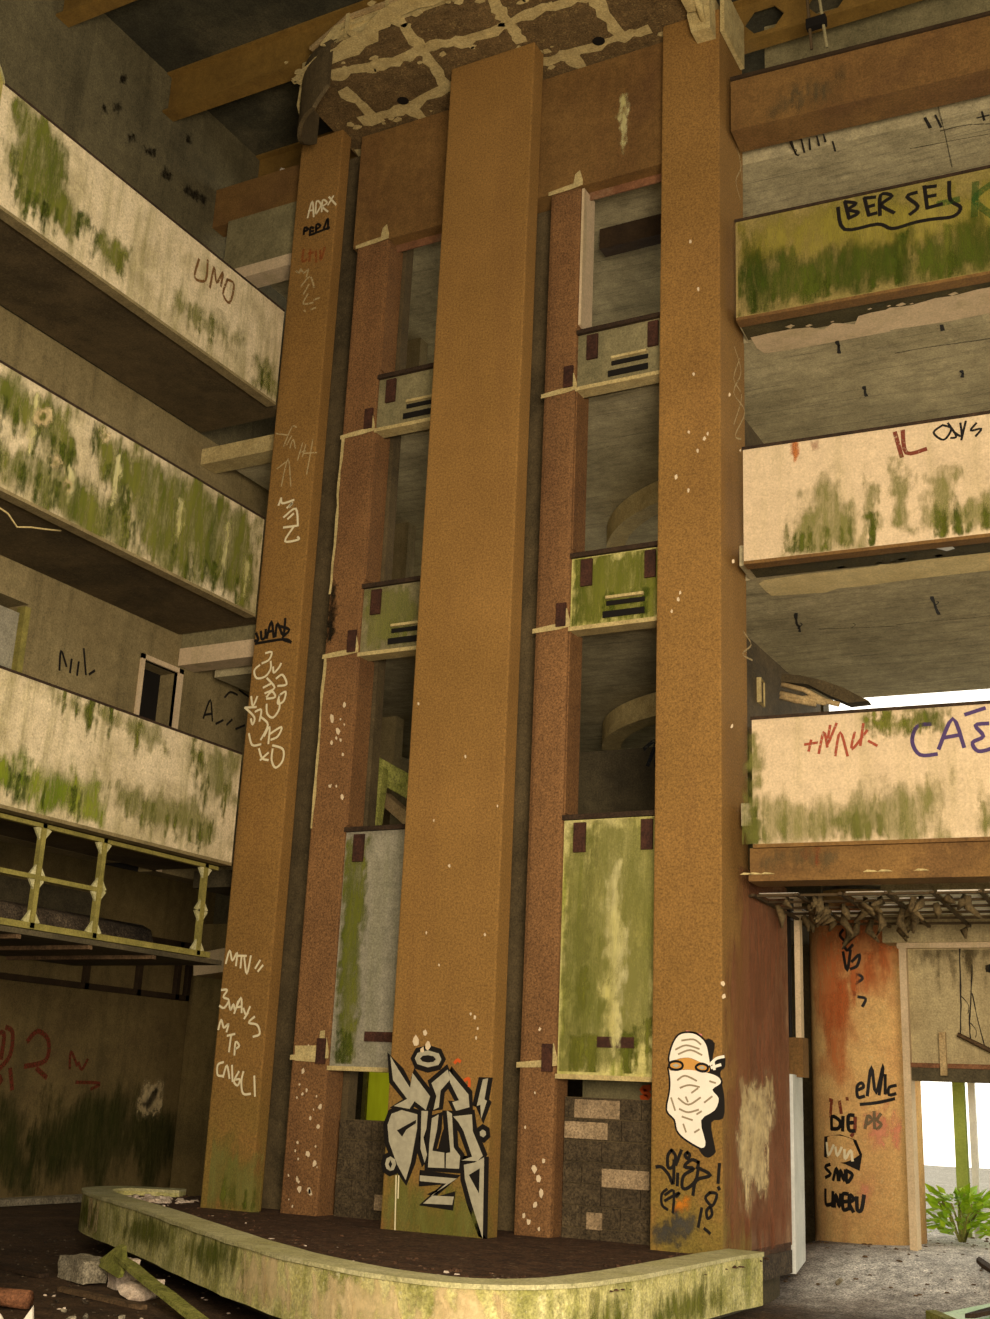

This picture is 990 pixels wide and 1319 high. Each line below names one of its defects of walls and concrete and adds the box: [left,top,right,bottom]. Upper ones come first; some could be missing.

peeling [284,0,663,130]
water stain [10,160,58,232]
water stain [19,428,74,504]
water stain [93,433,136,544]
water stain [171,499,249,604]
water stain [865,513,875,546]
water stain [935,510,990,538]
water stain [62,691,113,738]
water stain [125,738,227,851]
water stain [569,860,652,1074]
rust [816,909,899,1035]
water stain [0,1088,175,1196]